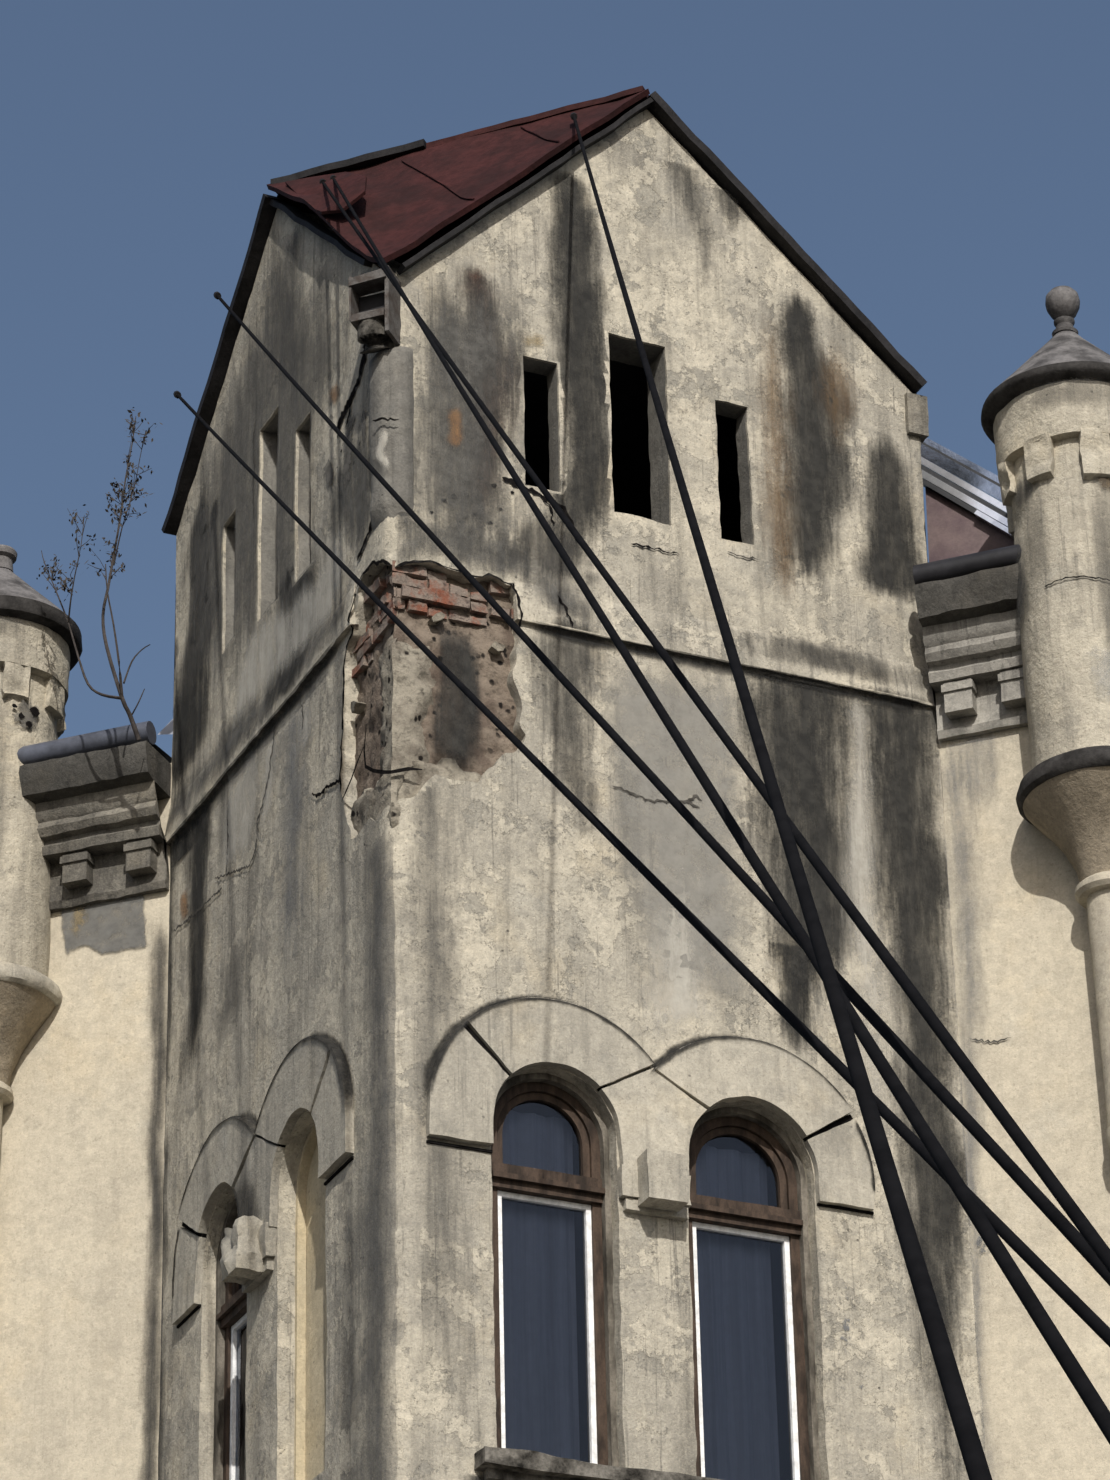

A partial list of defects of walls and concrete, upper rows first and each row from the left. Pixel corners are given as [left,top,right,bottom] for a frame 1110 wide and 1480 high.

crack [337,345,366,438]
leakage [516,175,610,576]
leakage [778,295,921,599]
leakage [172,492,210,783]
crack [174,705,304,931]
spalling [339,559,523,834]
crack [613,786,702,808]
leakage [143,805,354,1480]
leakage [425,673,979,1350]